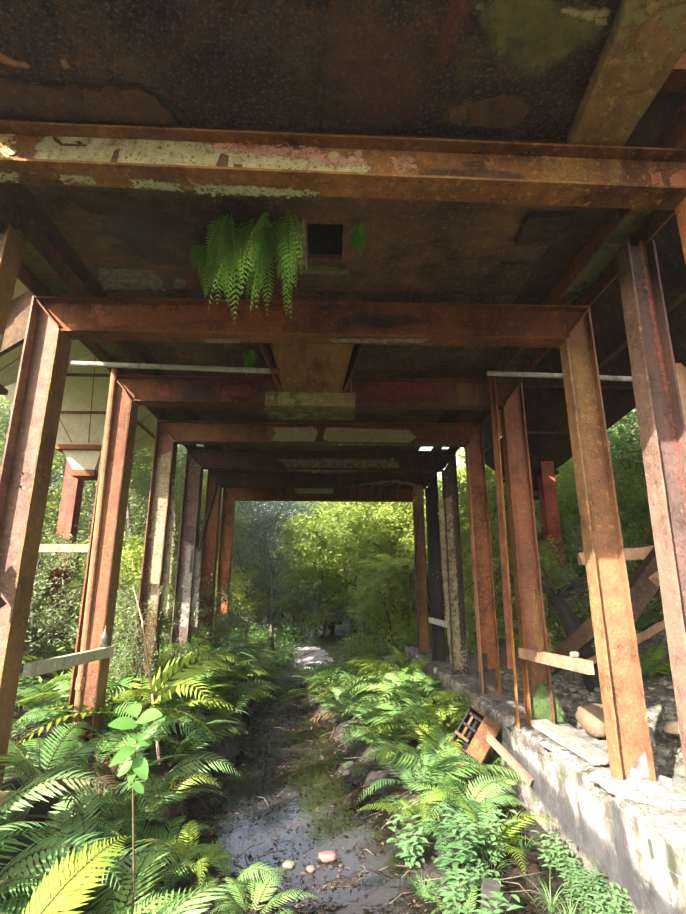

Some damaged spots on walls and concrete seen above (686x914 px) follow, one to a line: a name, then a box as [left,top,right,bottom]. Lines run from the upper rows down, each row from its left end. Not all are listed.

peeling [0,52,30,69]
rust [440,93,529,129]
peeling [0,134,18,158]
peeling [33,136,376,173]
peeling [0,170,22,183]
peeling [56,173,97,187]
peeling [129,178,323,199]
crack [646,853,686,883]